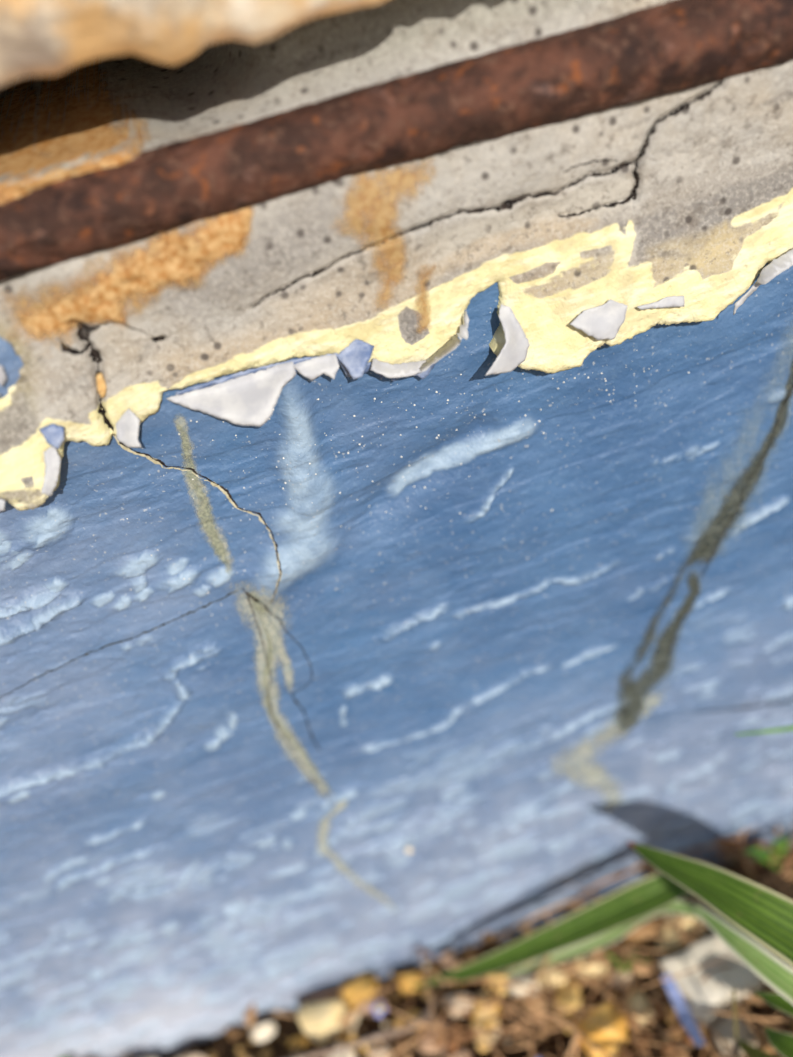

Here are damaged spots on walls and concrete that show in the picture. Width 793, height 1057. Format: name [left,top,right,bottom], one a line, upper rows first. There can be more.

spalling [0,0,671,185]
corrosion [0,0,793,338]
spalling [0,59,793,511]
crack [252,80,724,307]
crack [1,322,331,805]
damp [176,418,231,564]
damp [238,586,395,910]
damp [556,367,793,810]